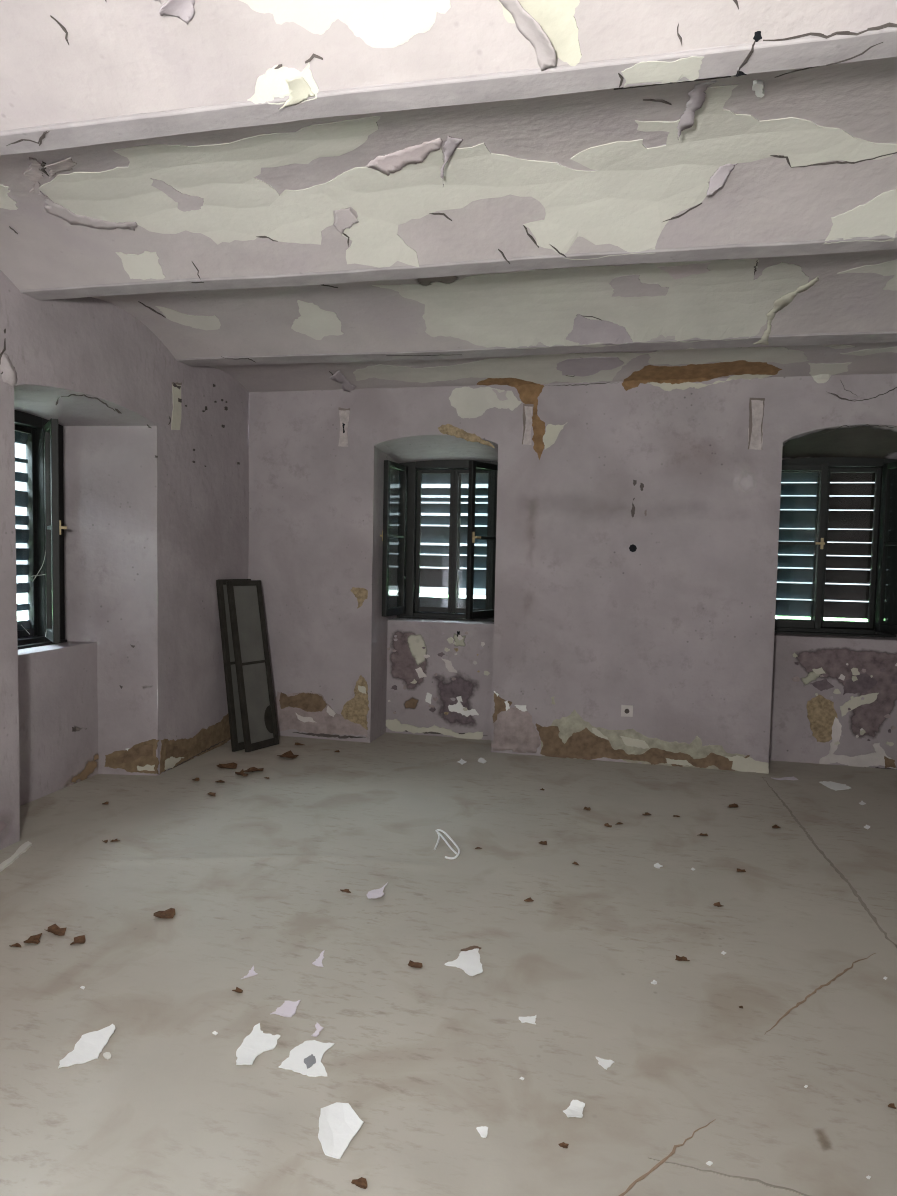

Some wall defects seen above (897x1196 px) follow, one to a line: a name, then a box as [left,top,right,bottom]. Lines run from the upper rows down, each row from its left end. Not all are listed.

peeling [154,0,195,25]
peeling [239,0,451,48]
peeling [497,0,582,71]
crack [738,22,897,78]
peeling [0,184,18,210]
peeling [24,53,897,460]
spalling [105,714,231,774]
spalling [275,675,369,737]
peeling [386,631,490,740]
spalling [536,696,769,774]
peeling [792,648,897,769]